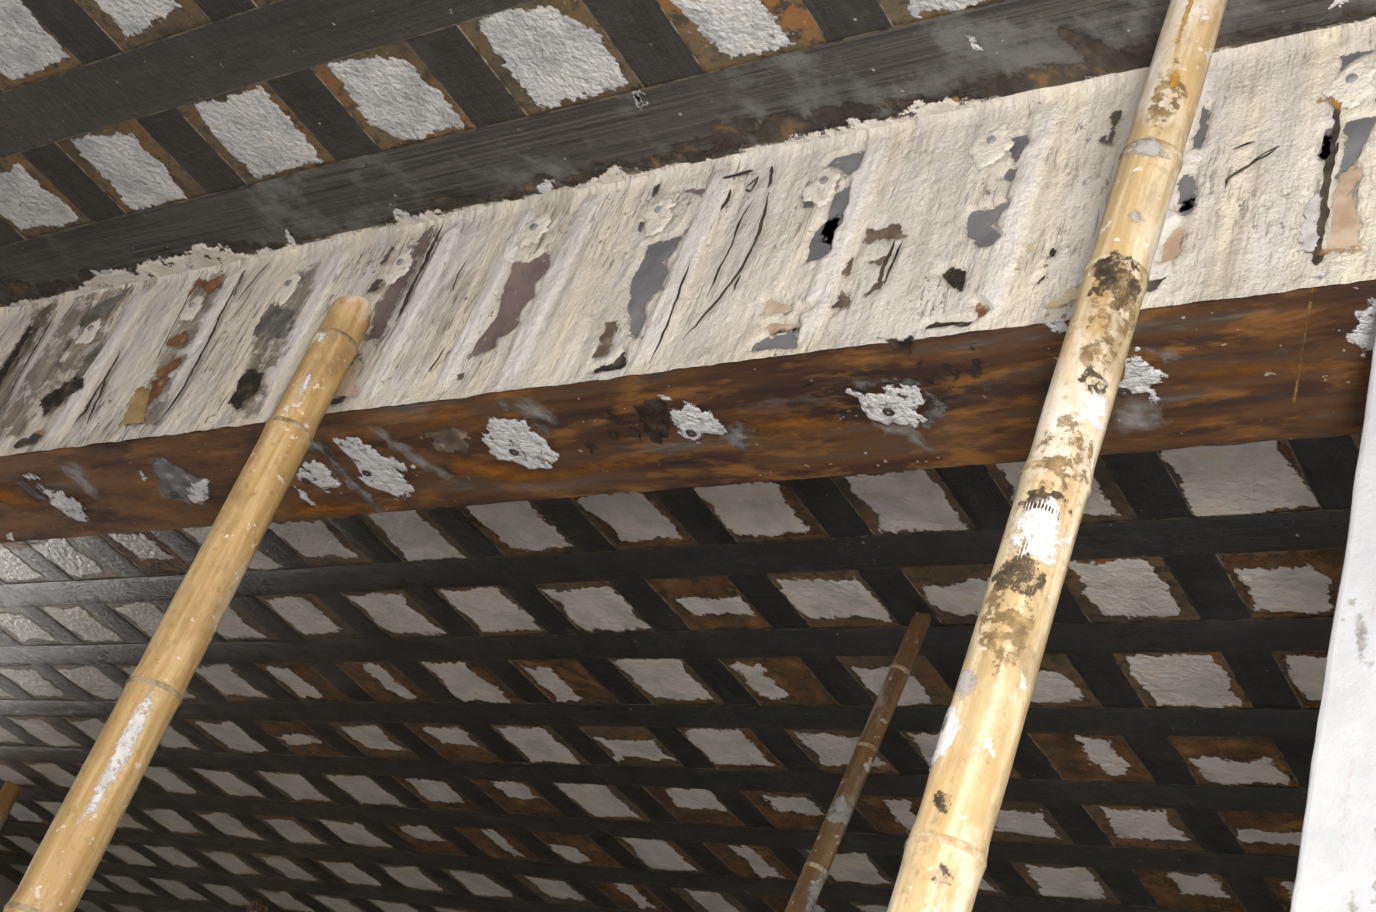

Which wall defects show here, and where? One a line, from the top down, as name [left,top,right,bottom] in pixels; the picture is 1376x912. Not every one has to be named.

peeling [0,285,133,448]
peeling [118,271,245,427]
peeling [227,262,321,423]
peeling [471,251,550,356]
peeling [592,222,689,373]
peeling [801,151,866,263]
peeling [831,223,909,308]
peeling [942,267,966,292]
peeling [925,303,987,329]
peeling [966,202,1009,247]
peeling [1147,174,1197,292]
peeling [1297,96,1376,255]